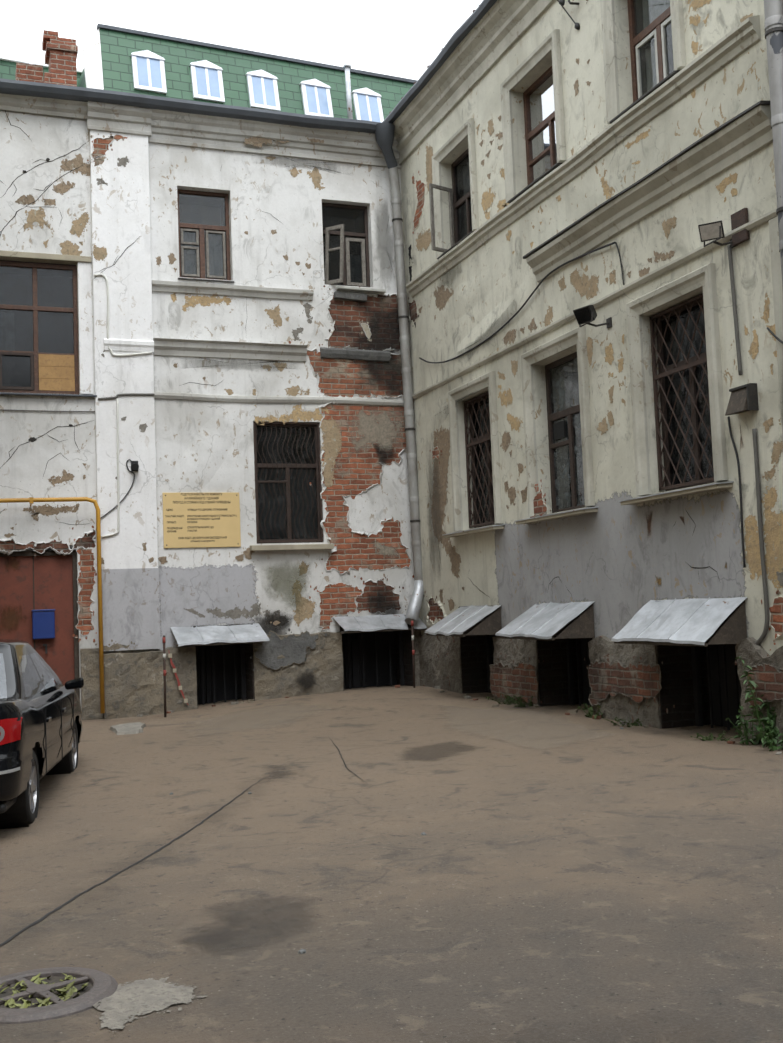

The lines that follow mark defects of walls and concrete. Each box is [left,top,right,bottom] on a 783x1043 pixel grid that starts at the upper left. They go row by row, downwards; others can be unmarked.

crack [0,111,90,236]
spalling [15,132,129,261]
peeling [289,167,325,190]
spalling [408,145,433,281]
spalling [433,285,454,320]
spalling [558,216,676,303]
peeling [23,504,80,521]
spalling [0,526,135,653]
flaking render [184,280,422,679]
spalling [426,589,454,630]
spalling [430,425,464,590]
spalling [735,418,783,718]